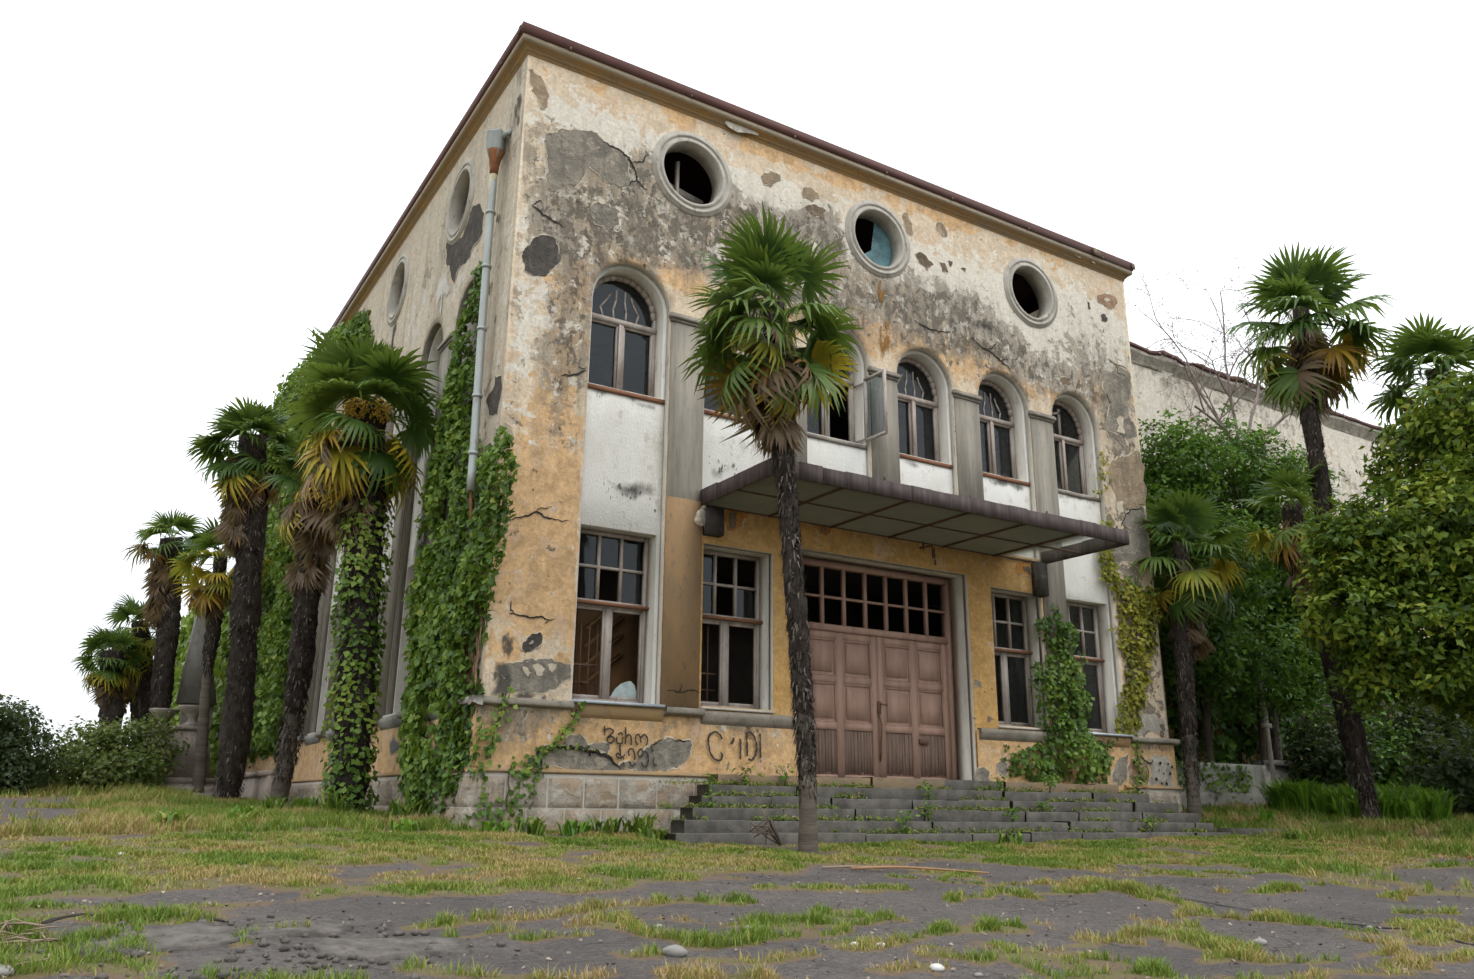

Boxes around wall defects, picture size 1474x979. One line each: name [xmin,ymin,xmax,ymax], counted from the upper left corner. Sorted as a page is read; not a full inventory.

spalling [544,128,631,231]
spalling [761,171,781,187]
spalling [801,187,826,218]
spalling [445,204,485,283]
peeling [902,212,966,273]
peeling [1087,293,1118,322]
spalling [486,375,502,417]
crack [510,506,569,522]
peeling [504,631,572,694]